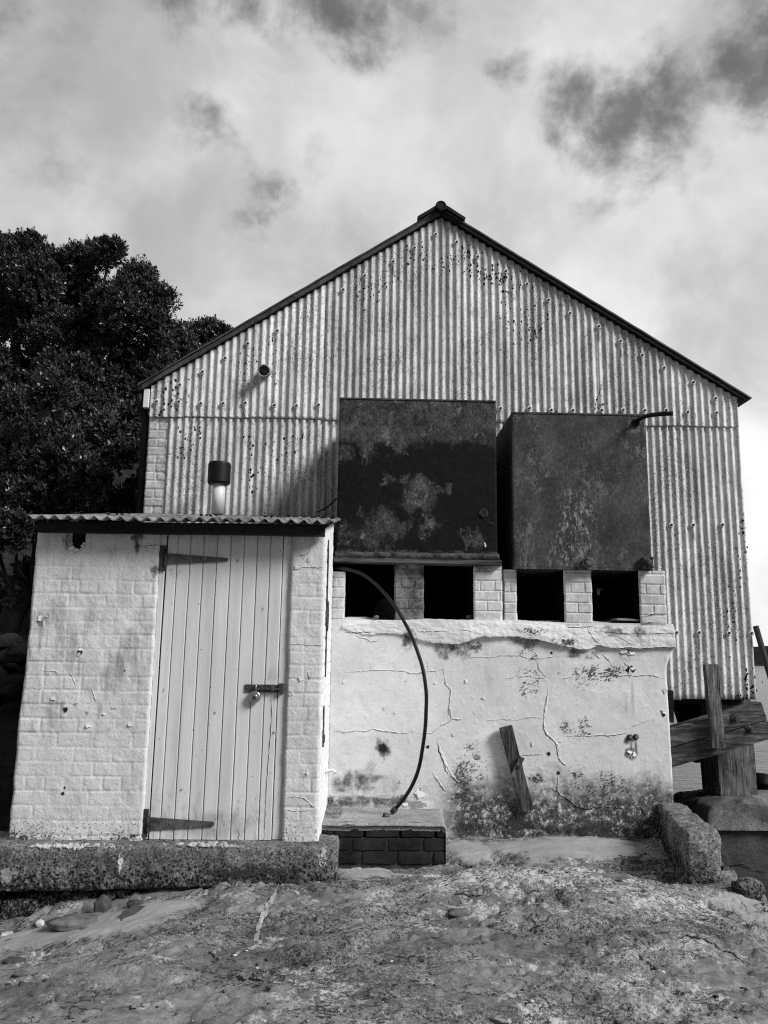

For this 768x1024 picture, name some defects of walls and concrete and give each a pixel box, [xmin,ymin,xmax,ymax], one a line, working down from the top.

crack [340,662,461,791]
crack [420,612,673,815]
spalling [619,649,636,675]